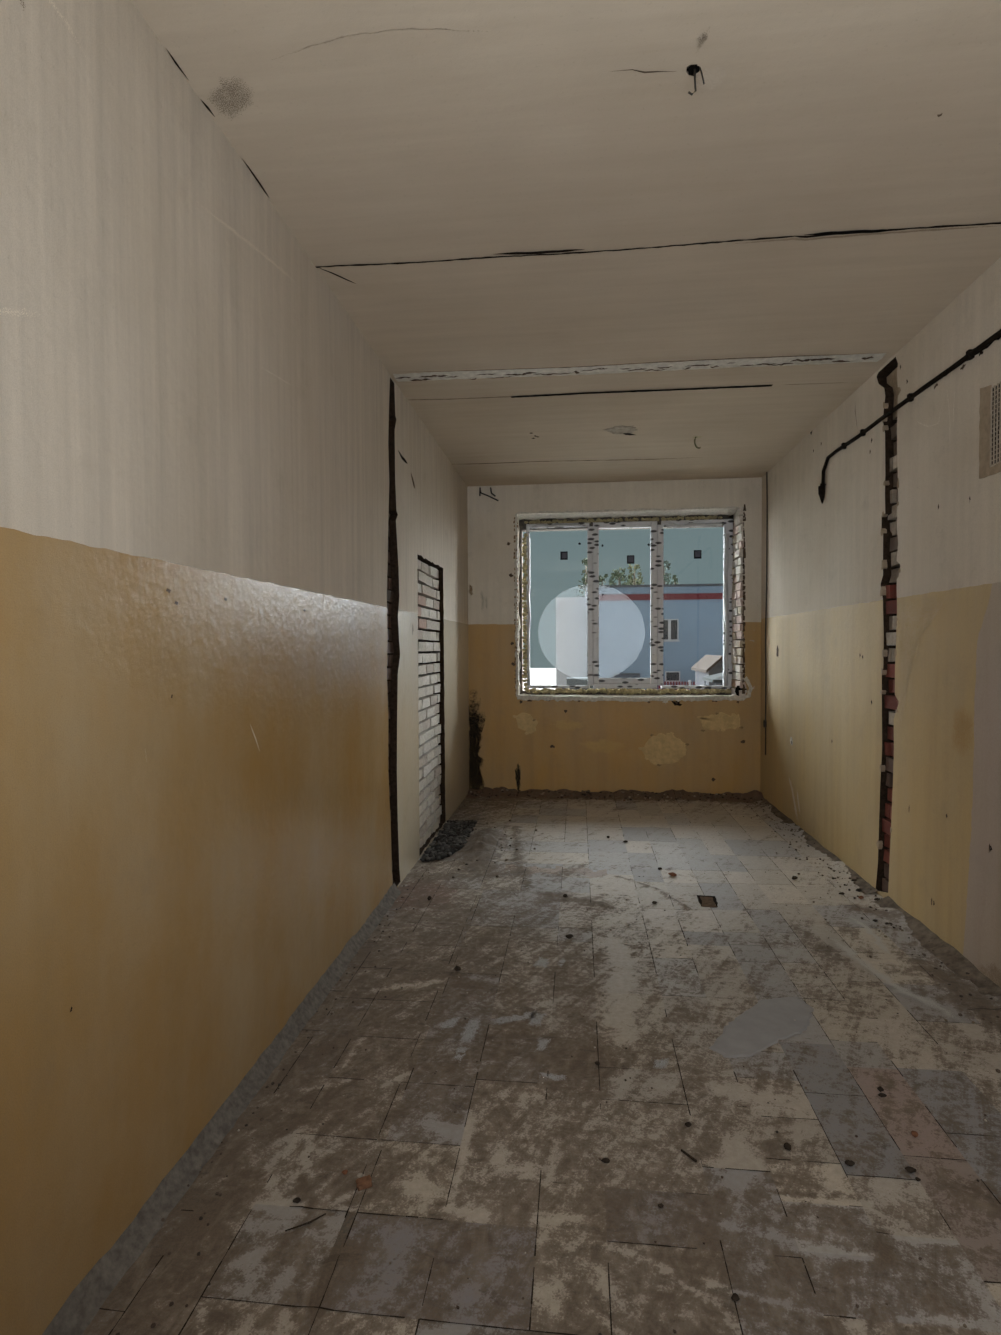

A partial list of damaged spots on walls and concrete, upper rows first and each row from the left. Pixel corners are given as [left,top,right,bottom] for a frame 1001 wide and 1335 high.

crack [167,50,215,117]
crack [243,160,269,197]
crack [315,222,1001,284]
spalling [513,504,753,735]
flaking render [876,402,901,892]